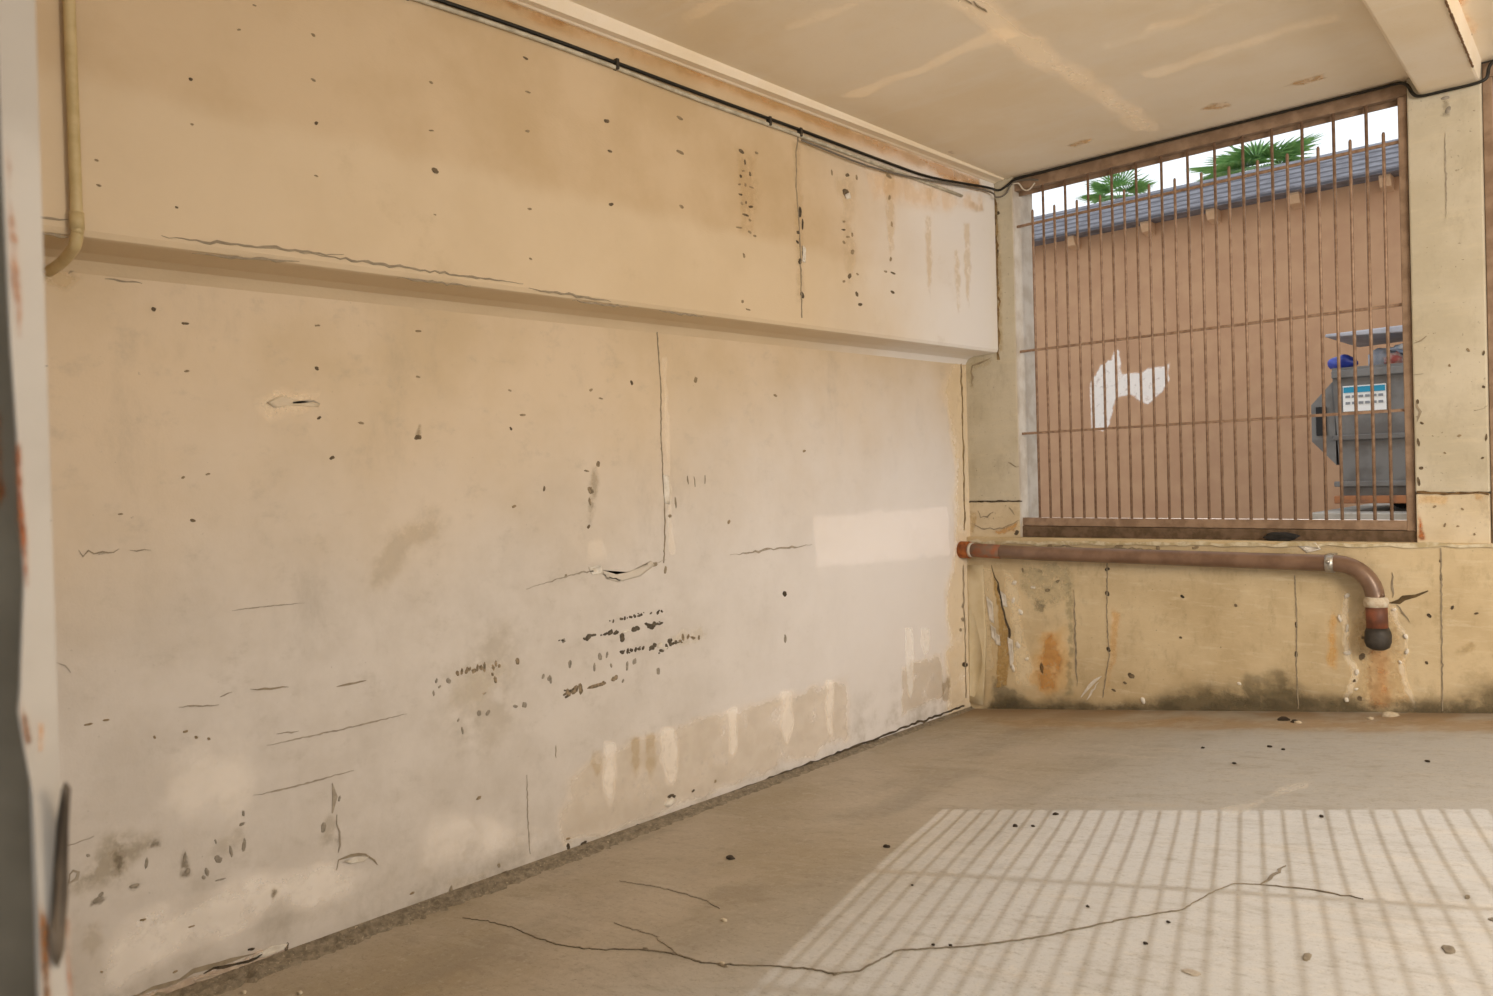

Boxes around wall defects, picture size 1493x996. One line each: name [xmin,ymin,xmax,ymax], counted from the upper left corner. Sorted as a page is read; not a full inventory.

crack [795,137,806,318]
crack [960,197,1022,530]
rust [0,445,27,572]
crack [732,565,968,792]
spalling [991,565,1014,687]
rust [1040,637,1060,688]
water stain [988,580,1493,713]
crack [1390,548,1444,711]
spalling [664,789,695,806]
crack [462,865,1363,976]